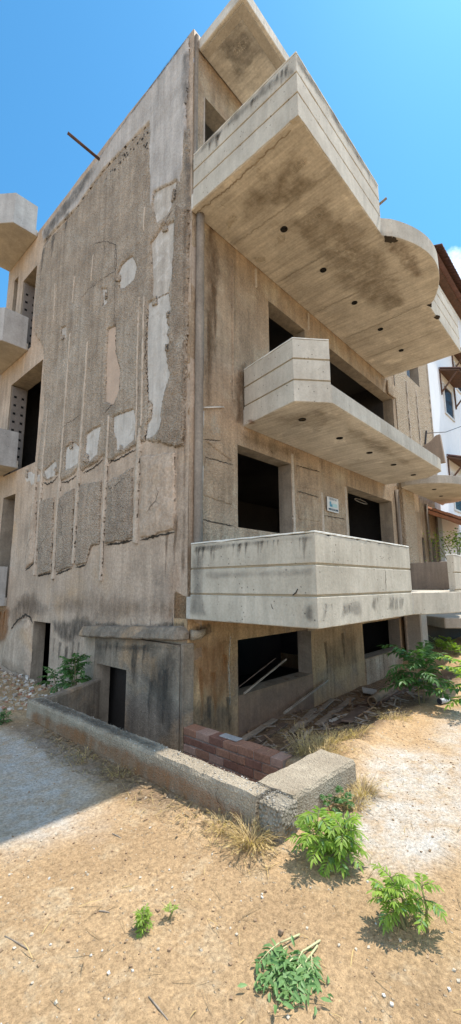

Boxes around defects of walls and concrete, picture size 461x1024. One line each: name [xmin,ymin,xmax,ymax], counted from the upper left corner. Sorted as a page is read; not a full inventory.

peeling [7,396,101,486]
peeling [102,183,176,451]